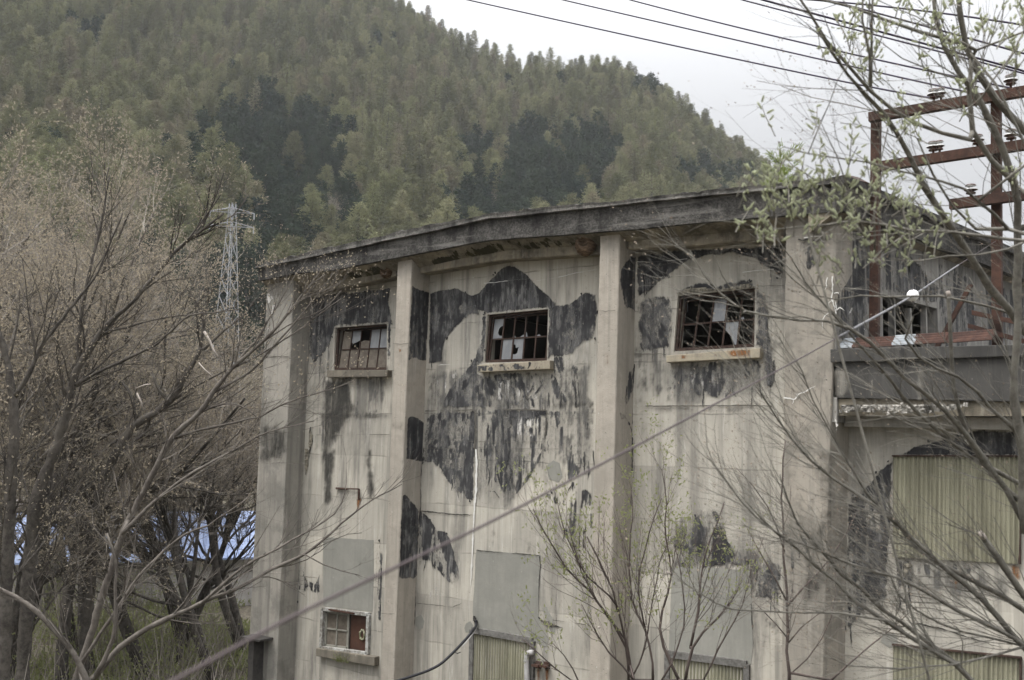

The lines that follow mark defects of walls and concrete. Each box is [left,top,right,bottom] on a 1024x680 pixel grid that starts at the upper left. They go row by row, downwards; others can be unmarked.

damp [318,313,385,503]
damp [430,365,593,585]
damp [677,362,737,401]
spalling [839,402,968,415]